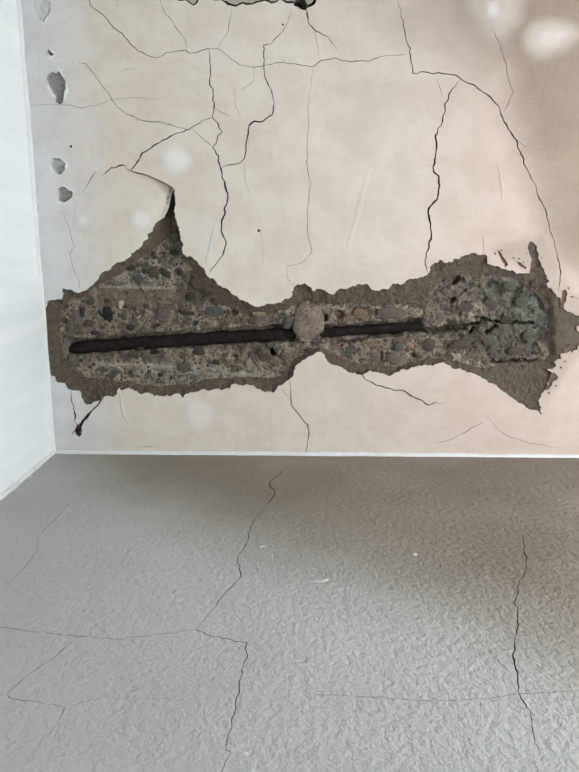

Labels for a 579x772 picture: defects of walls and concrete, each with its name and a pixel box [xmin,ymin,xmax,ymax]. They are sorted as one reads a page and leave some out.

peeling [46,68,69,105]
peeling [49,156,68,175]
crack [32,0,578,299]
spalling [46,171,579,414]
crack [71,392,104,437]
crack [281,387,309,450]
crack [359,371,441,405]
crack [0,467,285,770]
crack [382,534,565,747]